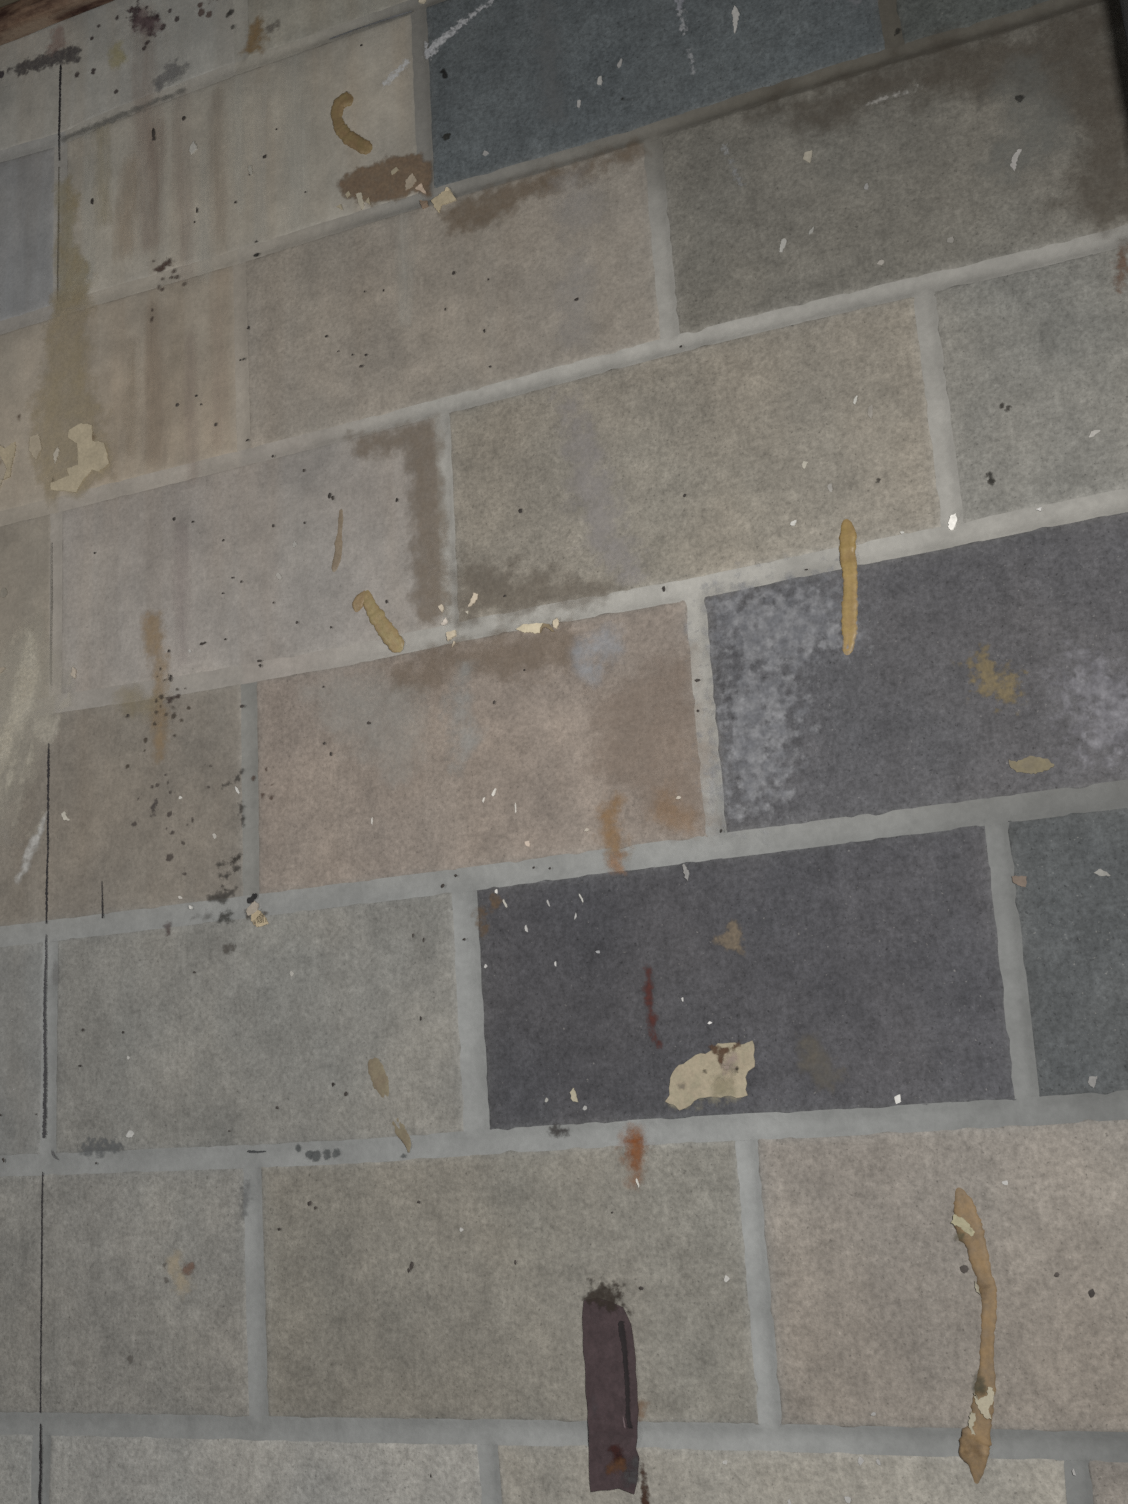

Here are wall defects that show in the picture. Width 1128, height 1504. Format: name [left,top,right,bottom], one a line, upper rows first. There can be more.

crack [55,65,63,302]
peeling [336,154,456,213]
peeling [0,423,110,493]
crack [47,542,55,686]
leakage [17,816,45,880]
spalling [665,1041,755,1111]
crack [38,743,58,1504]
rust [627,1134,642,1167]
peeling [951,1214,975,1236]
peeling [968,1387,995,1435]